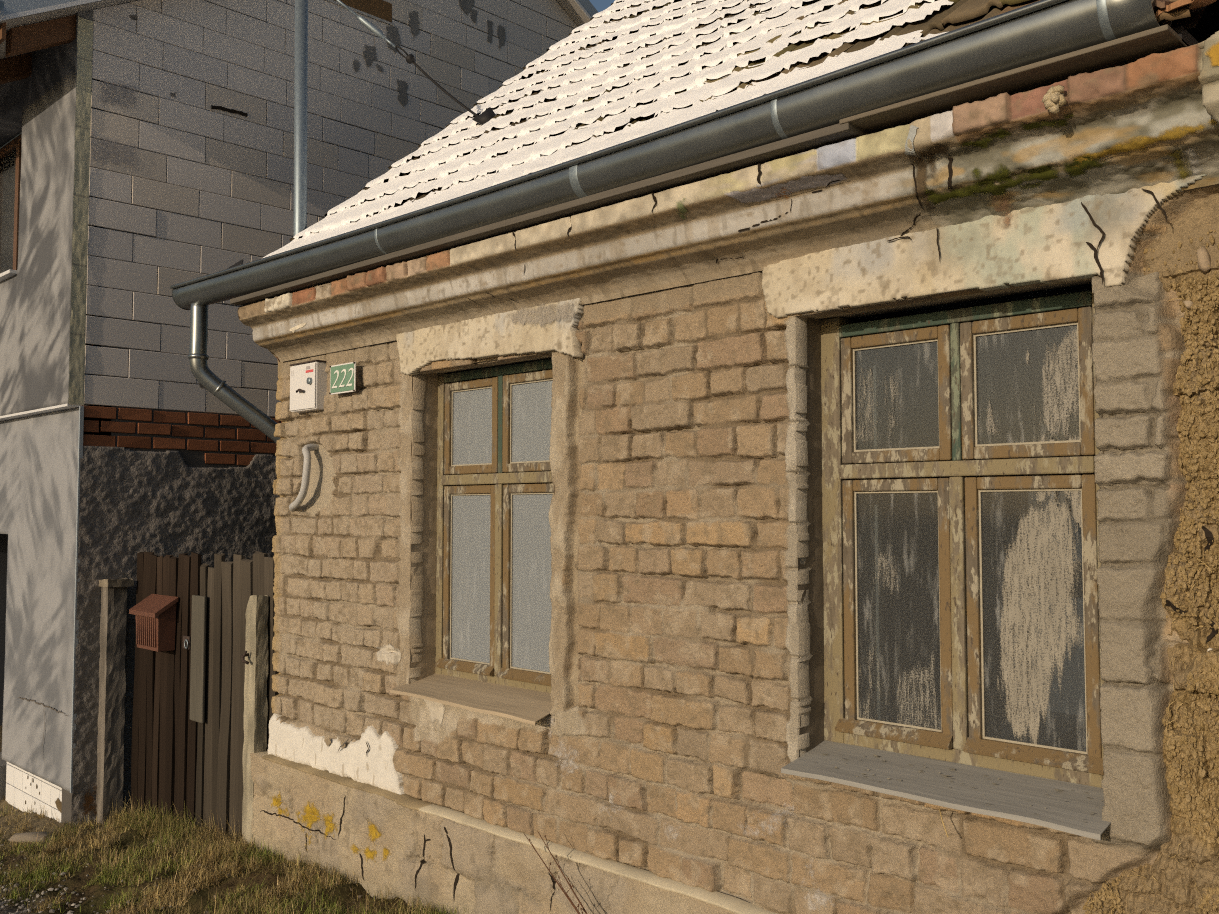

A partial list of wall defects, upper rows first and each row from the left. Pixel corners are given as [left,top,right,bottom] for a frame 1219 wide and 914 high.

crack [888,125,940,261]
water stain [909,145,948,211]
crack [946,157,954,189]
crack [1142,189,1167,222]
water stain [1168,149,1202,179]
crack [1081,202,1105,284]
spalling [1083,193,1219,914]